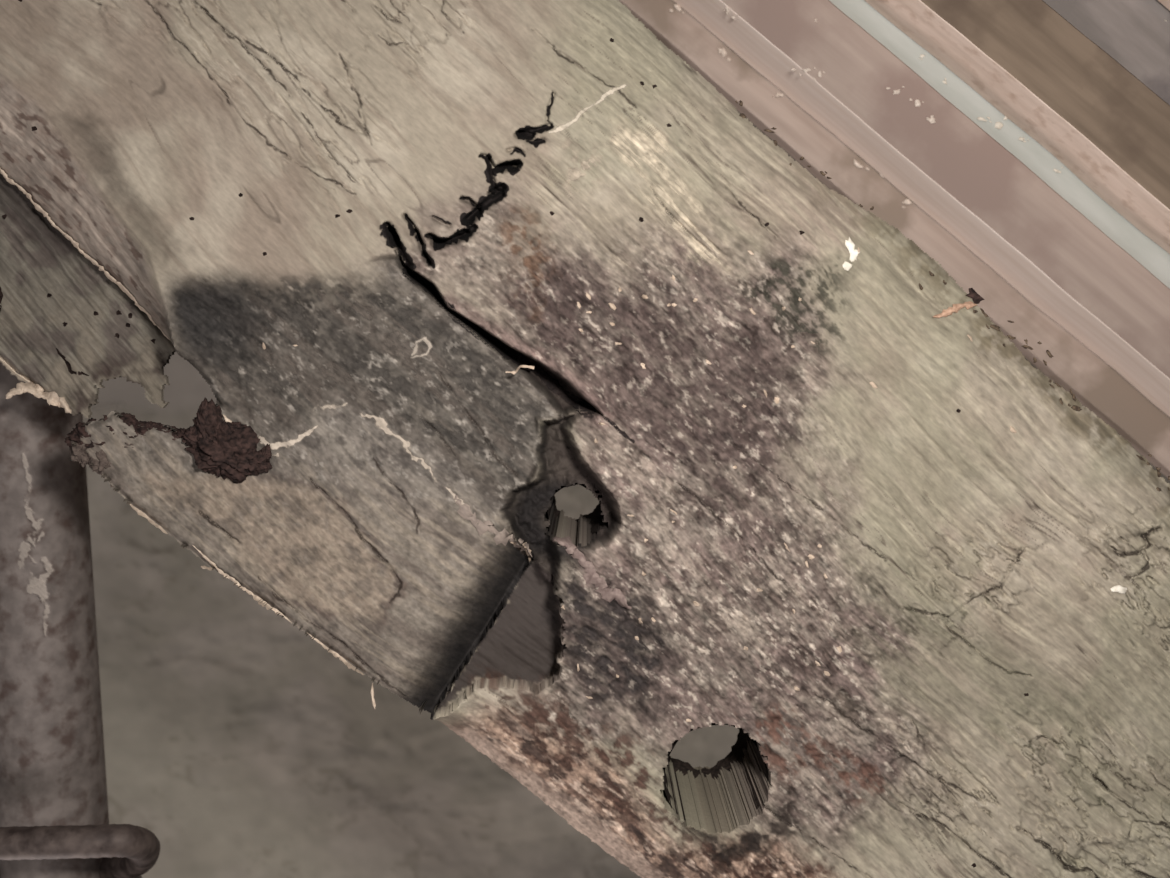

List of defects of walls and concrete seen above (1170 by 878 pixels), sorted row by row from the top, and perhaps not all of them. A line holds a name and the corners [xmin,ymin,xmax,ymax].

crack [195,0,366,194]
crack [380,92,635,443]
crack [56,348,89,376]
peeling [258,425,318,457]
water stain [178,281,588,560]
peeling [361,414,433,476]
water stain [508,286,781,490]
peeling [446,487,532,562]
peeling [552,536,632,610]
crack [1111,527,1159,577]
water stain [559,576,664,713]
crack [1024,830,1098,878]